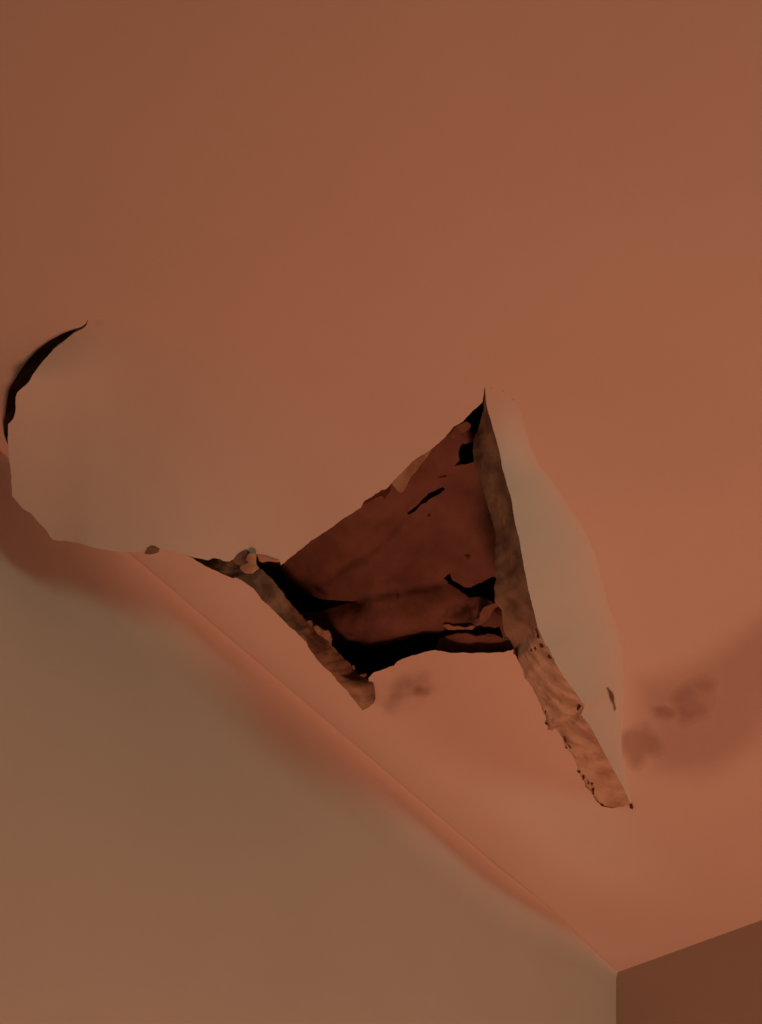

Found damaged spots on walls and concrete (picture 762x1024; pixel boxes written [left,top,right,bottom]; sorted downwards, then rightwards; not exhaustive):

crack [2,320,88,443]
spalling [473,395,537,649]
spalling [185,554,375,711]